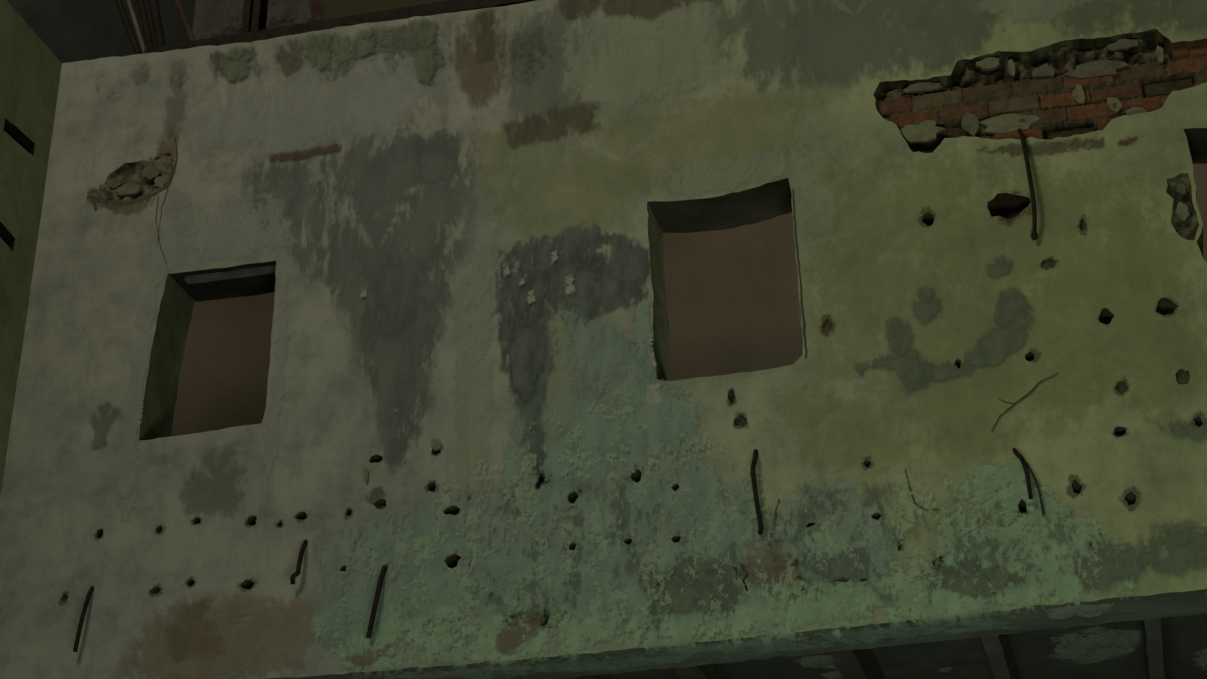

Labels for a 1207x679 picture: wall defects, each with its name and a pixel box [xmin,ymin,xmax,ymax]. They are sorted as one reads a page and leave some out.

flaking render [86,126,179,248]
damp [504,0,1091,147]
flaking render [873,29,1207,241]
damp [252,129,471,474]
damp [314,270,1207,679]